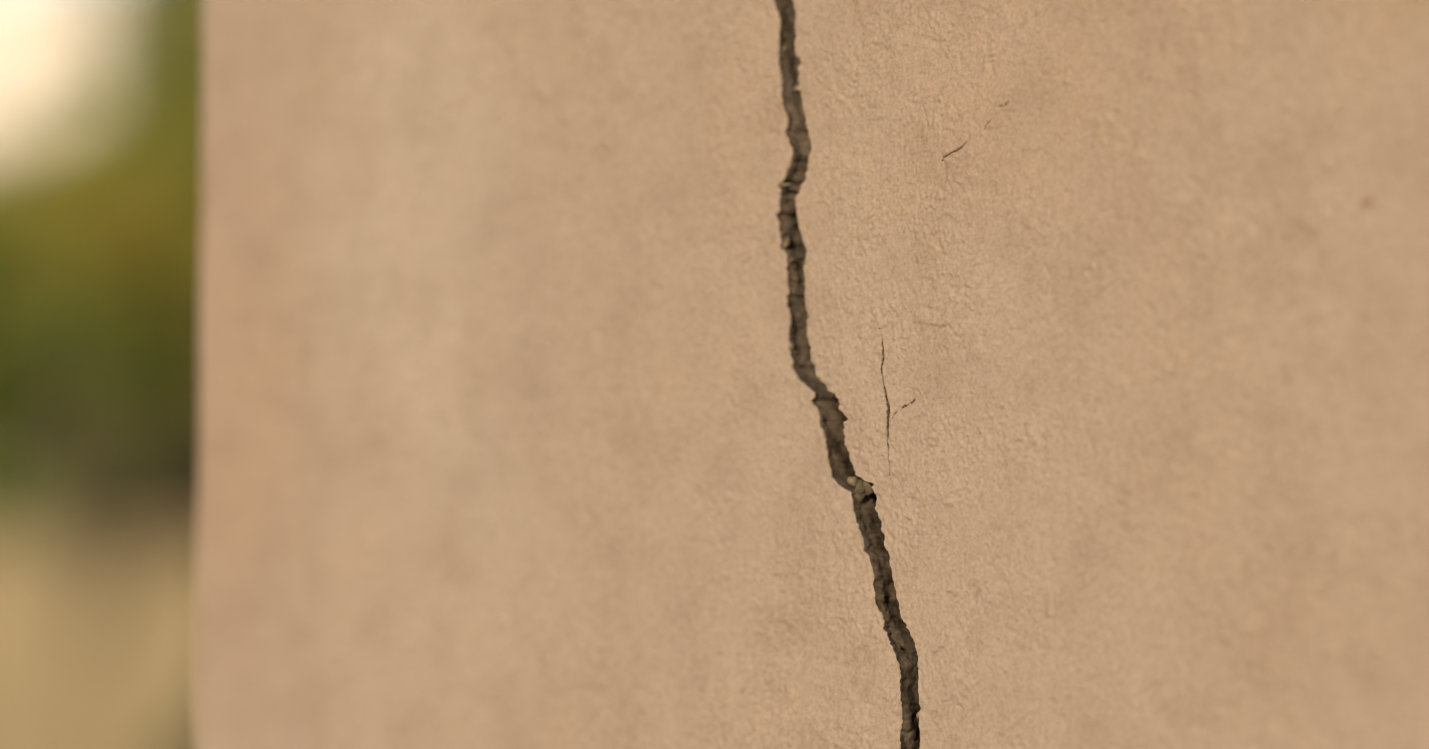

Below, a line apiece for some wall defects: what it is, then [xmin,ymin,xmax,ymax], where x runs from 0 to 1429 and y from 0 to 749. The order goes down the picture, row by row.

crack [774,0,921,749]